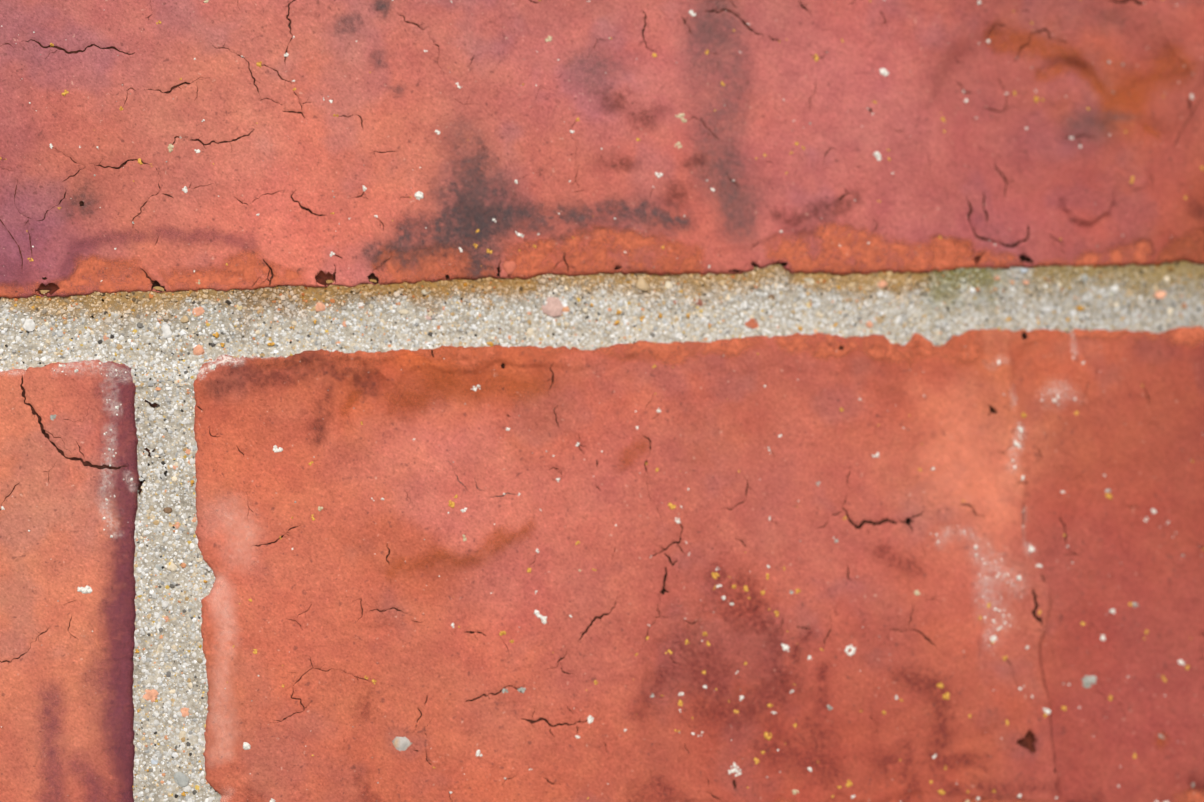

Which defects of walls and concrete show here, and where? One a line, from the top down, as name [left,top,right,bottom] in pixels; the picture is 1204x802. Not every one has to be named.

crack [1,39,135,58]
crack [122,77,200,108]
crack [172,131,252,146]
crack [215,0,310,118]
crack [4,147,326,253]
leakage [367,201,687,280]
crack [966,147,1064,255]
crack [0,376,127,510]
crack [638,394,697,653]
crack [817,472,925,552]
crack [1022,576,1045,628]
crack [465,599,617,752]